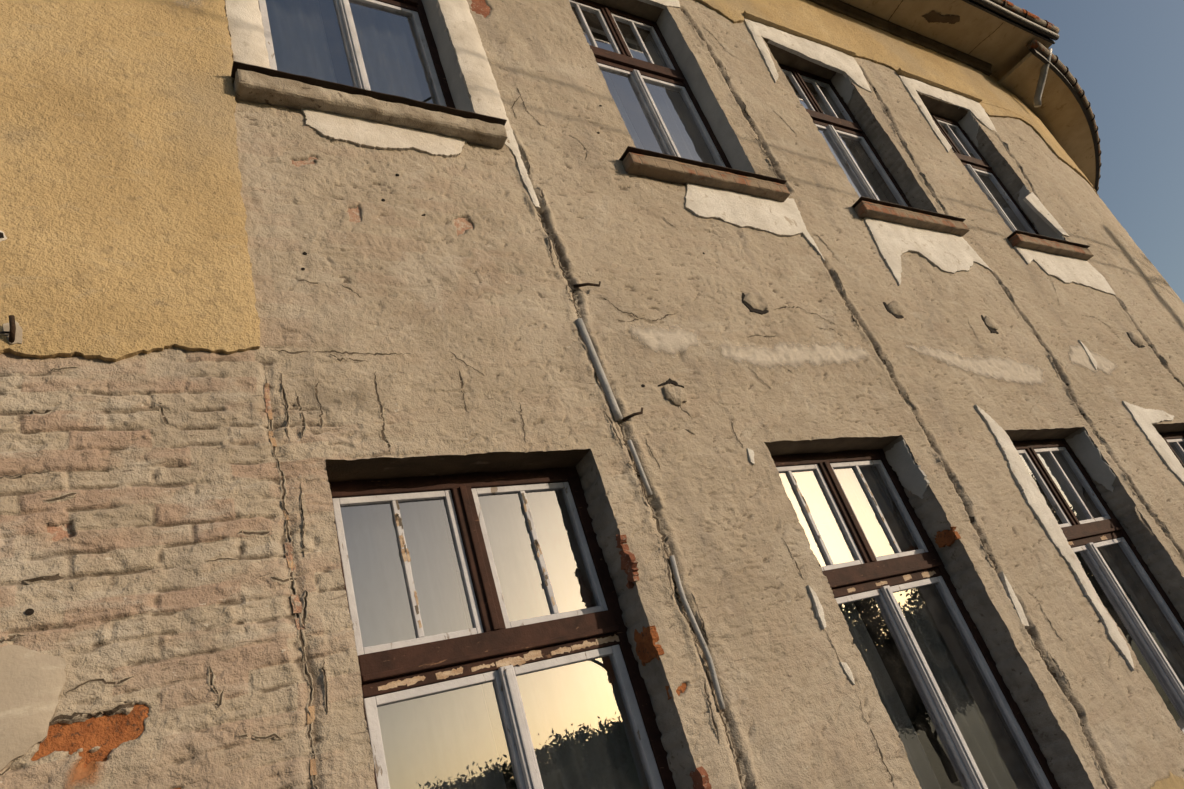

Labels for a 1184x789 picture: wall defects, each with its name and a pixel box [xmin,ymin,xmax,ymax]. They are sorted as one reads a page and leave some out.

peeling [301,108,467,158]
peeling [684,183,825,263]
peeling [864,217,993,286]
crack [447,351,485,413]
crack [205,349,415,789]
flaking render [616,534,640,589]
peeling [378,634,620,691]
flaking render [634,625,664,666]
crack [49,676,149,726]
flaking render [31,704,149,768]
crack [0,757,24,777]
flaking render [690,766,712,789]